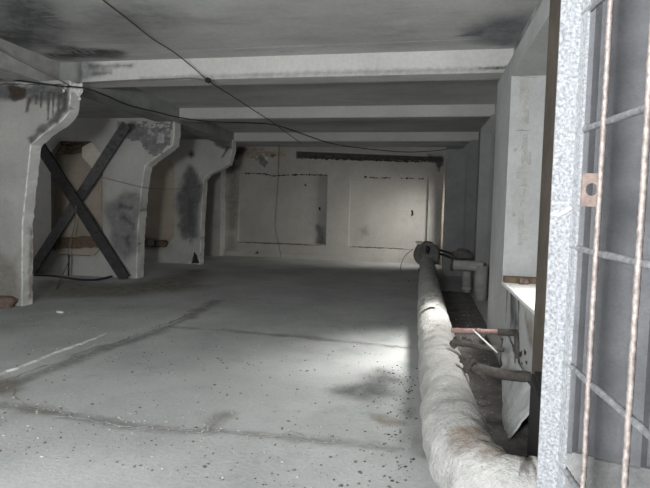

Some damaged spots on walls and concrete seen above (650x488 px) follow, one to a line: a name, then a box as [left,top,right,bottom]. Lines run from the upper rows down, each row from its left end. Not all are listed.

damp [24,84,68,142]
damp [178,167,200,237]
crack [0,299,418,452]